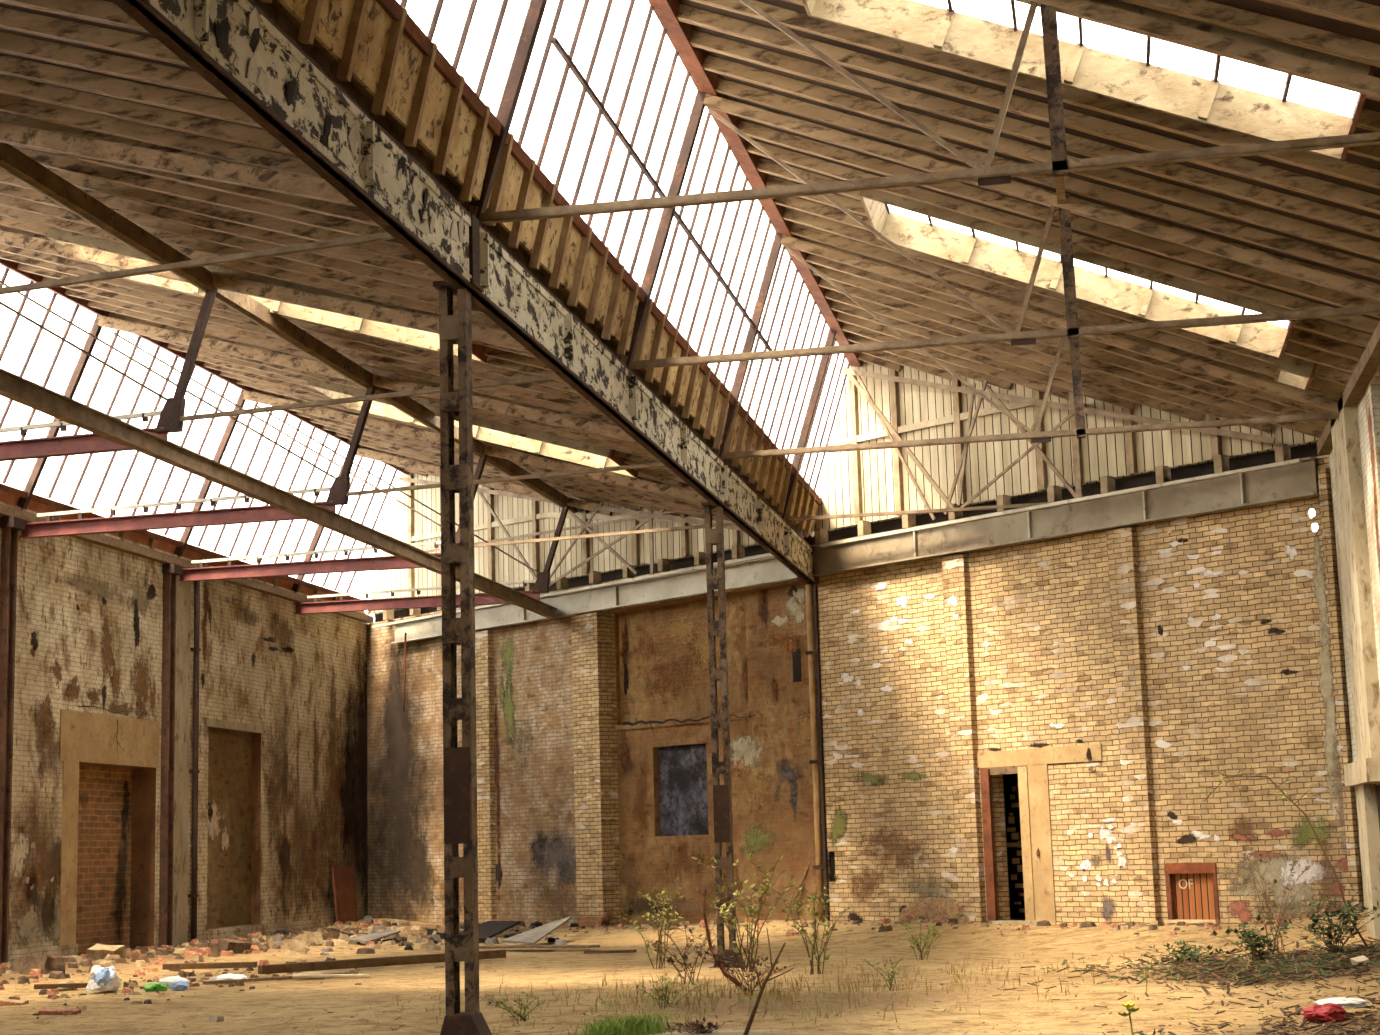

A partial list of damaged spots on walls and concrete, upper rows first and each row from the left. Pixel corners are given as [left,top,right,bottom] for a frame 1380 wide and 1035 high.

peeling [209,0,297,106]
peeling [397,156,465,243]
peeling [35,584,157,730]
rust [736,589,799,699]
spalling [1260,620,1285,634]
water stain [37,713,63,786]
water stain [251,649,367,915]
water stain [494,671,530,899]
rust [619,733,647,836]
water stain [9,807,62,939]
water stain [405,836,464,912]
peeling [1069,818,1126,920]